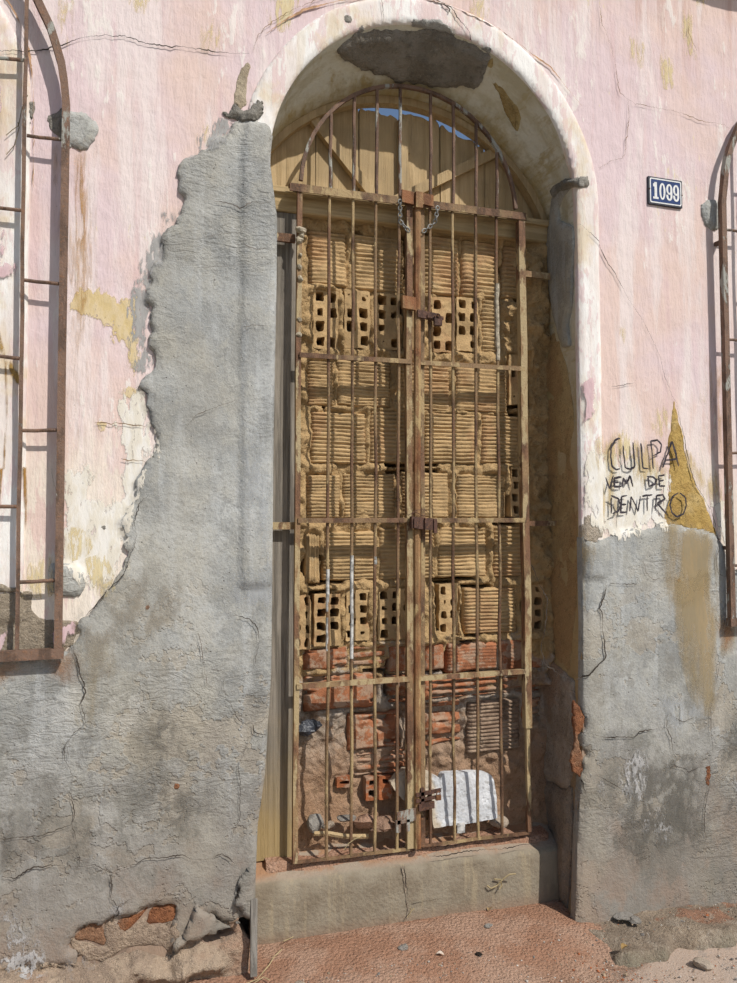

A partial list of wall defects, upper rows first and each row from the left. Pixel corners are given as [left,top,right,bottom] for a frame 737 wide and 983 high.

crack [2,0,314,54]
peeling [70,287,141,372]
peeling [63,386,161,595]
spalling [0,561,80,651]
crack [0,616,272,921]
crack [582,636,725,853]
damp [620,751,699,851]
efflorescence [1,915,46,979]
spalling [70,865,256,983]